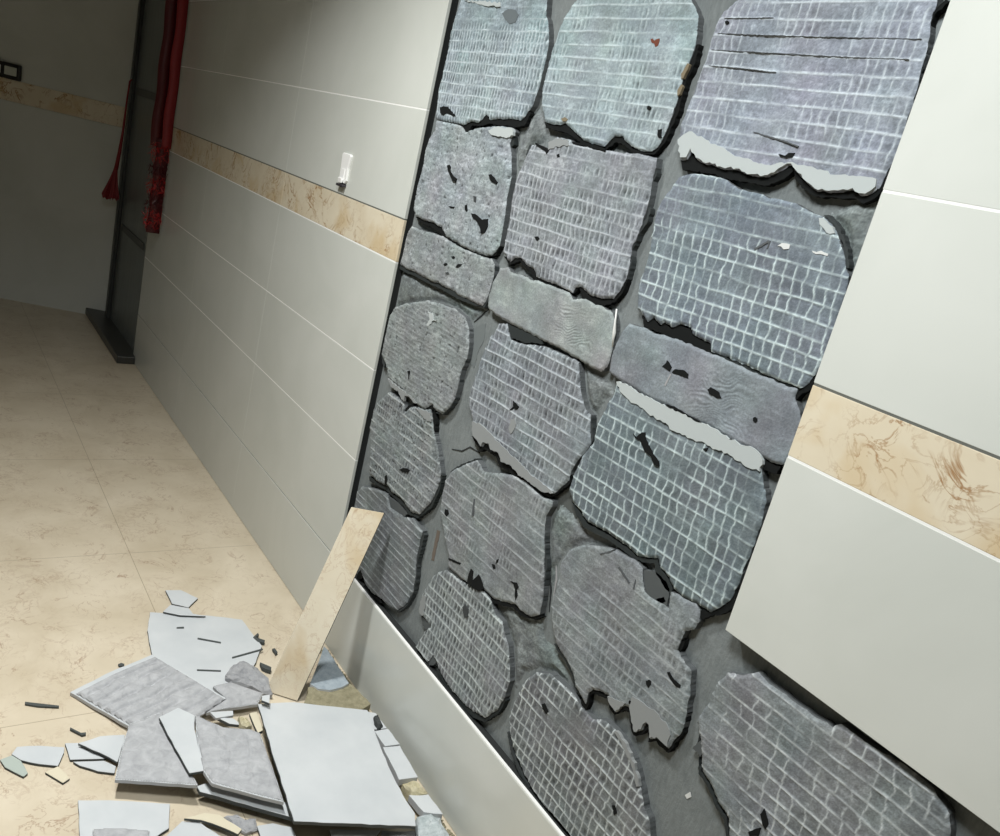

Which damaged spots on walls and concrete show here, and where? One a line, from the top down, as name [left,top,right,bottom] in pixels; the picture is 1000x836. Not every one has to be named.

hole [471,213,488,233]
spalling [633,432,660,467]
spalling [447,567,484,591]
spalling [644,569,671,606]
hole [748,808,769,836]